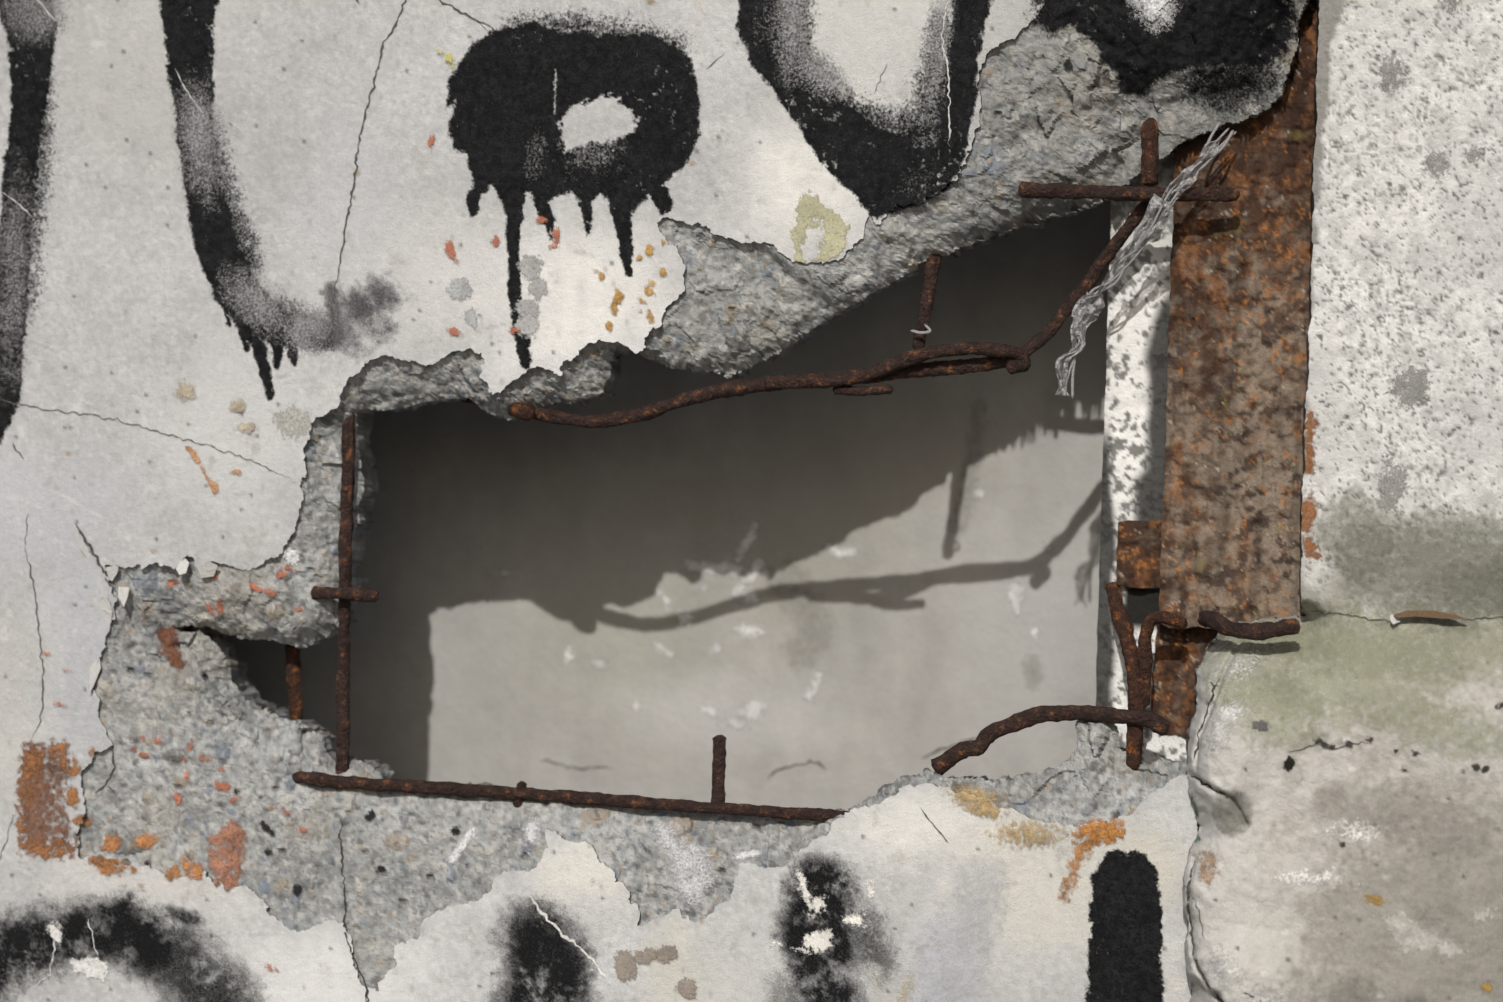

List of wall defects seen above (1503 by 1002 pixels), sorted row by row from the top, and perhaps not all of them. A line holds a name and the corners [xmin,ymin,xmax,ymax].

crack [328,0,495,338]
corrosion [599,240,667,331]
spalling [273,0,1310,588]
crack [0,399,305,488]
spalling [1197,610,1300,641]
spalling [76,441,1188,991]
crack [1192,680,1228,799]
peeling [1203,701,1268,755]
crack [1292,741,1368,752]
corrosion [14,742,159,875]
peeling [675,979,697,999]
crack [1186,862,1261,1002]